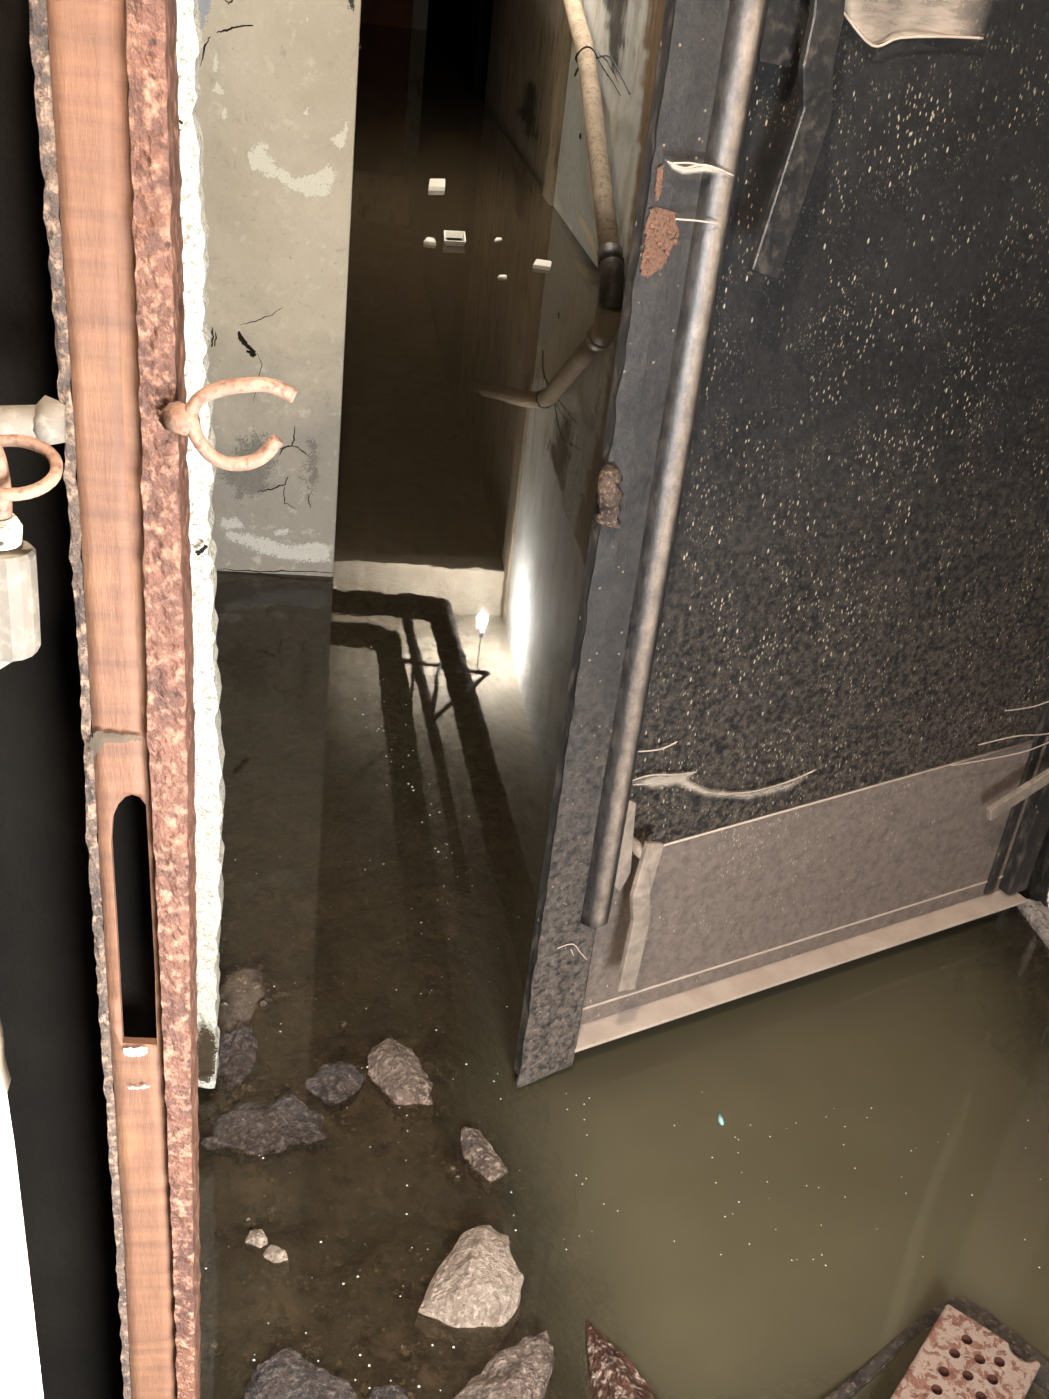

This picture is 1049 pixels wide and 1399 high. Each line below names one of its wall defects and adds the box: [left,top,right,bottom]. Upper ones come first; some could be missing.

corrosion [639,165,680,280]
peeling [124,1047,147,1057]